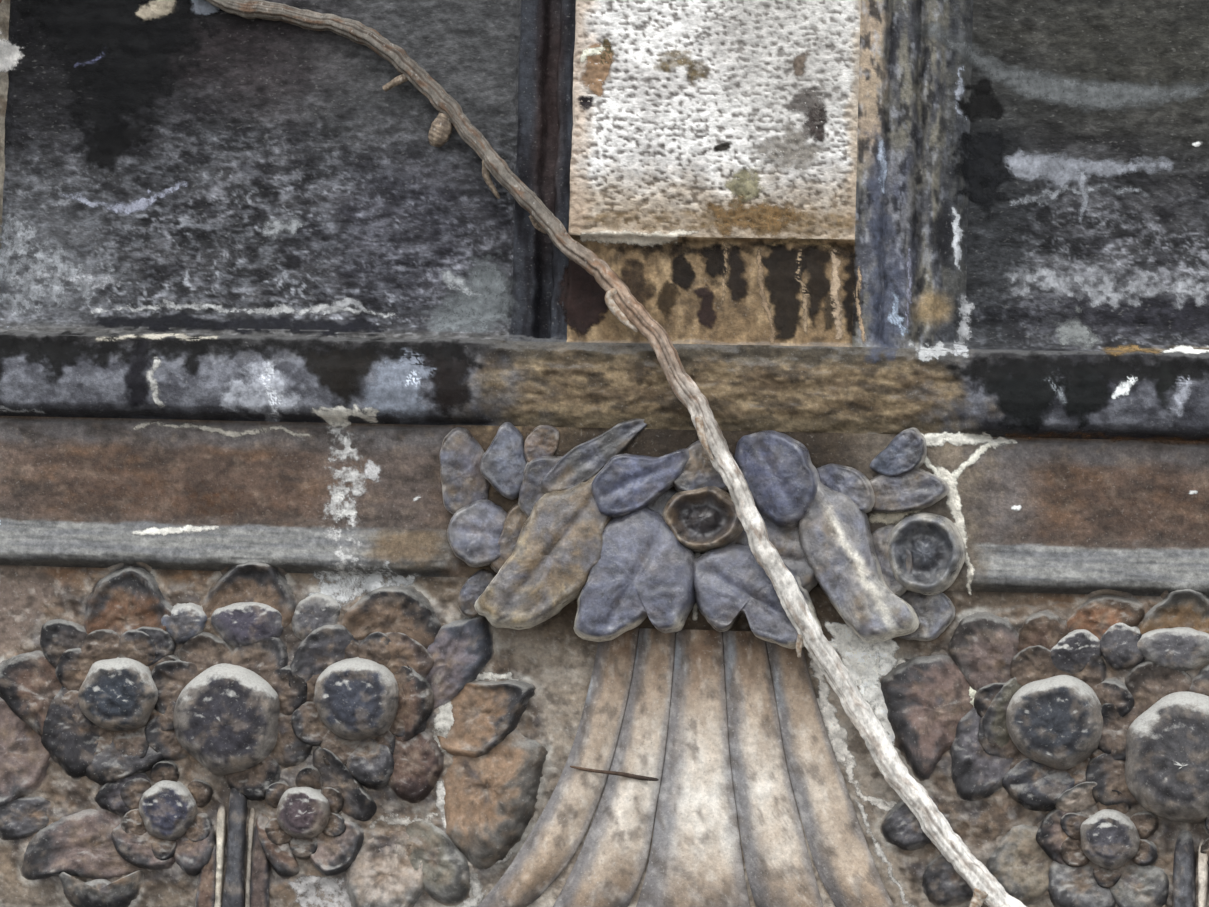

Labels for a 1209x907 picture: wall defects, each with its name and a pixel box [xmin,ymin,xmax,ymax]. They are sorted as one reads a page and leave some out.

peeling [0,31,24,72]
water stain [916,23,1209,109]
water stain [62,182,187,214]
water stain [1006,152,1171,221]
water stain [580,140,912,359]
water stain [558,259,608,335]
water stain [0,210,511,610]
water stain [922,268,1209,595]